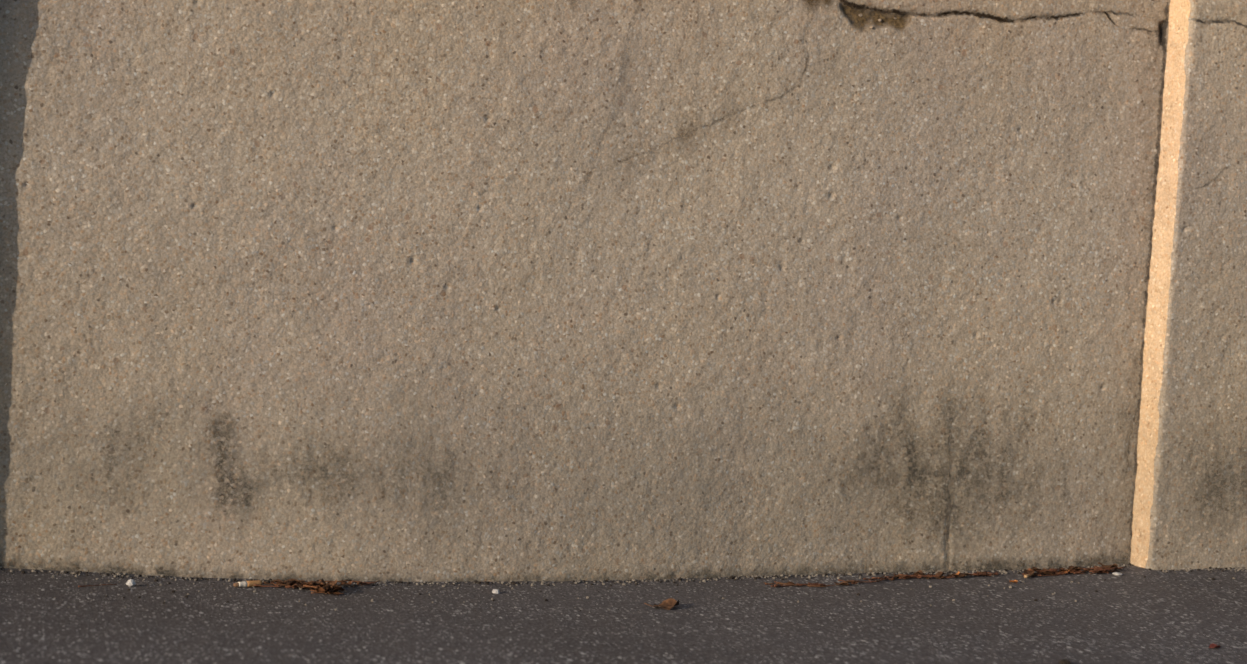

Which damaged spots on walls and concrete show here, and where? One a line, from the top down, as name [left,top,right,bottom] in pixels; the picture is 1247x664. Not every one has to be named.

crack [840,0,1247,563]